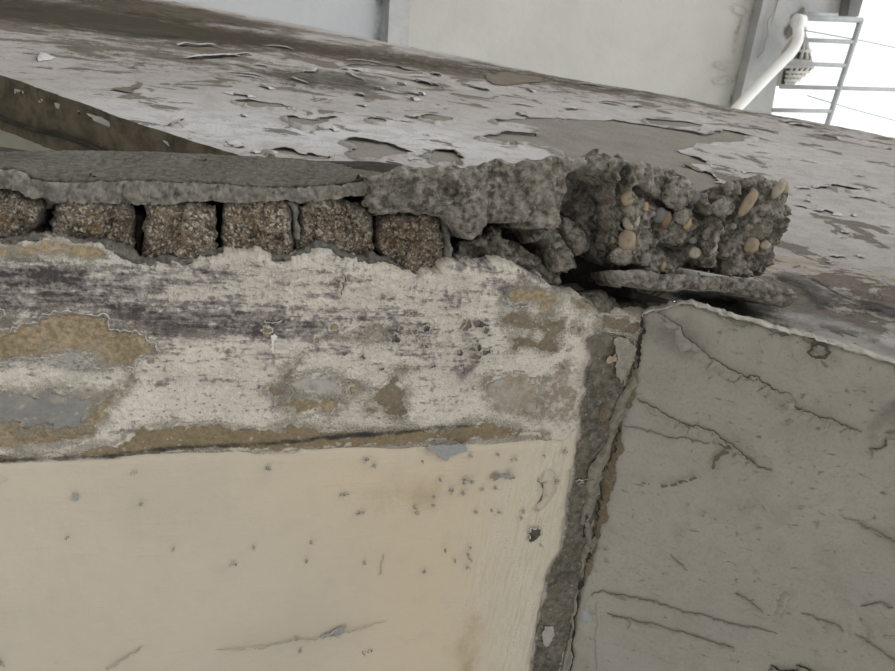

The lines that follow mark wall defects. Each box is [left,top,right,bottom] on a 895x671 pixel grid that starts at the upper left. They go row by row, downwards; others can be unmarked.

peeling [36,52,55,61]
peeling [177,42,251,59]
peeling [103,82,143,92]
peeling [338,59,442,101]
peeling [460,72,544,92]
peeling [223,91,342,131]
peeling [354,92,456,125]
peeling [821,184,879,202]
water stain [114,308,246,342]
spalling [0,111,857,671]
crack [565,311,895,671]